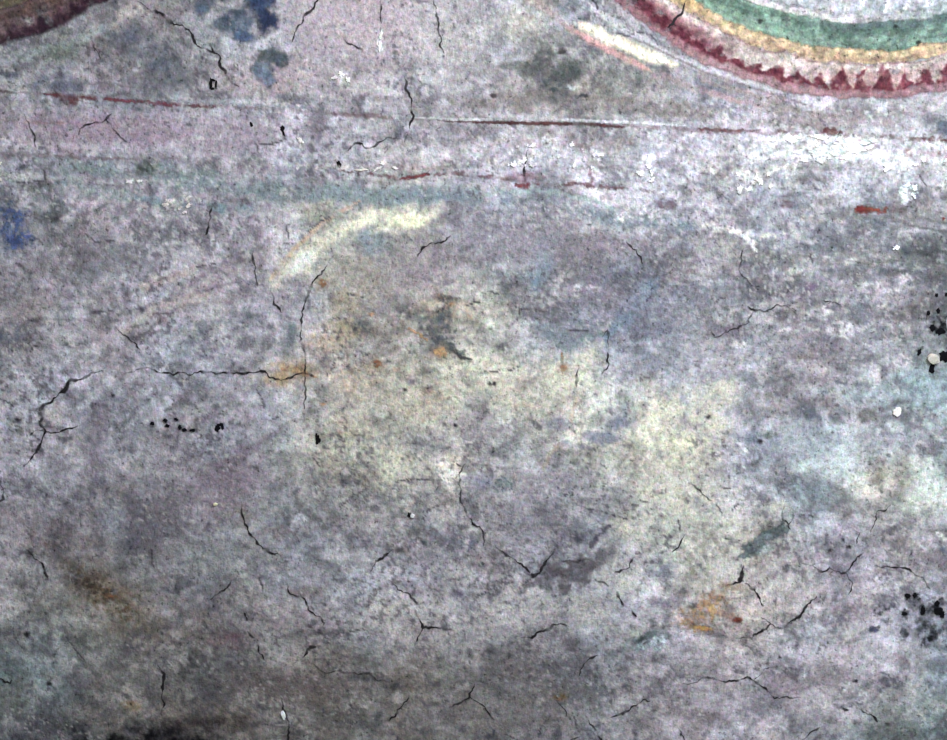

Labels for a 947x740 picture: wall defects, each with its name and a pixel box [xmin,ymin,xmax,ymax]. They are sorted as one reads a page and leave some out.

crack [138,1,239,87]
crack [292,0,318,42]
crack [117,254,327,409]
damp [927,292,947,335]
damp [929,351,947,373]
crack [23,370,103,467]
crack [457,463,553,578]
crack [395,585,440,641]
crack [733,566,817,638]
damp [869,593,946,646]
crack [688,667,801,699]
damp [108,719,225,740]